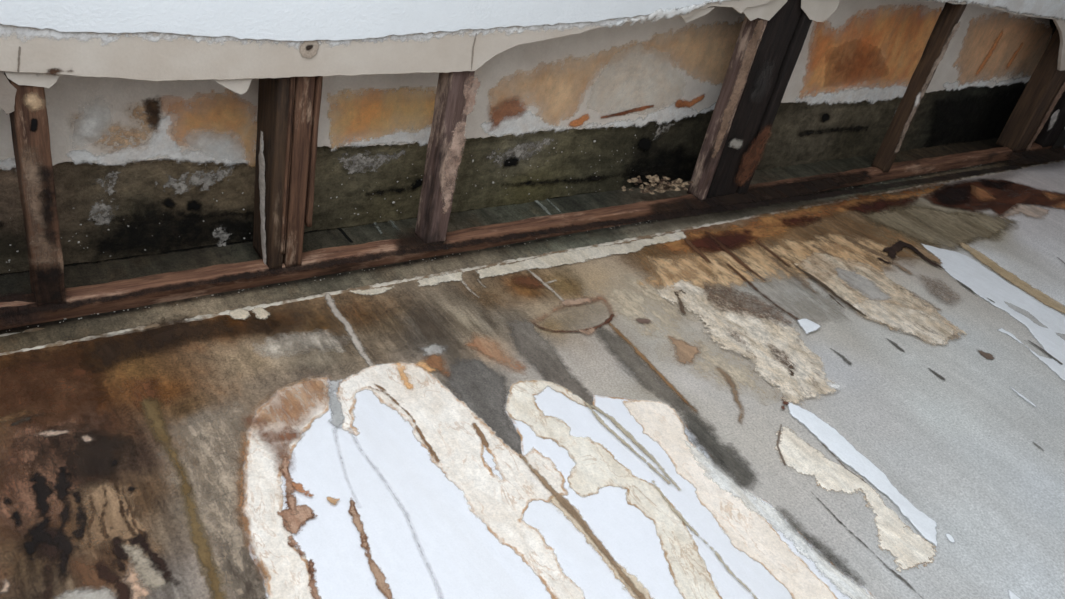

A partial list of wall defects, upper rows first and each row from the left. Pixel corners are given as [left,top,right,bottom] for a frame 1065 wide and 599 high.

water stain [88,99,161,149]
water stain [155,166,234,194]
water stain [338,149,405,174]
water stain [487,138,553,168]
water stain [628,146,697,189]
water stain [926,85,1025,147]
water stain [88,171,254,263]
flaking render [795,253,967,345]
flaking render [654,279,840,404]
water stain [0,316,275,599]